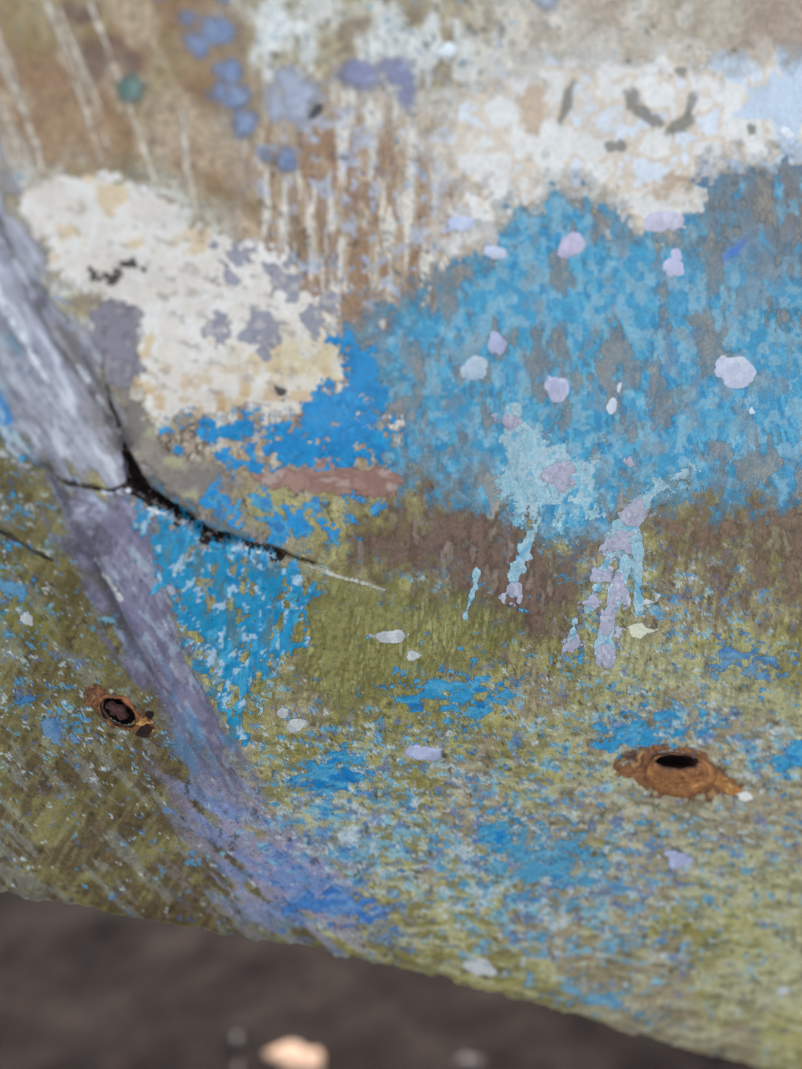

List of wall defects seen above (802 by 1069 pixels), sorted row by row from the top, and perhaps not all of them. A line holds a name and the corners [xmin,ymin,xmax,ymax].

peeling [13,35,802,768]
crack [54,330,385,591]
corrosion [84,684,156,738]
peeling [267,721,443,824]
corrosion [613,743,744,803]
peeling [748,736,802,783]
peeling [424,763,642,923]
peeling [617,783,701,871]
peeling [269,861,426,955]
peeling [462,958,681,1042]